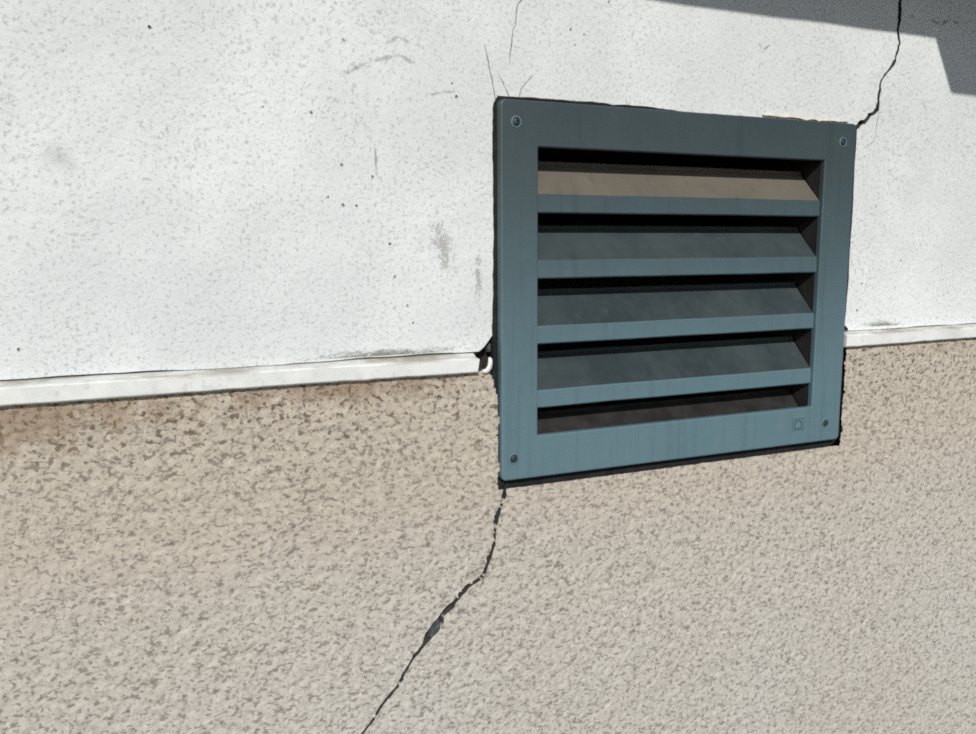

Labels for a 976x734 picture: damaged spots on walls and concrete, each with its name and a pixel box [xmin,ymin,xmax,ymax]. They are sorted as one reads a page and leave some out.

crack [856,0,902,145]
crack [361,480,508,734]